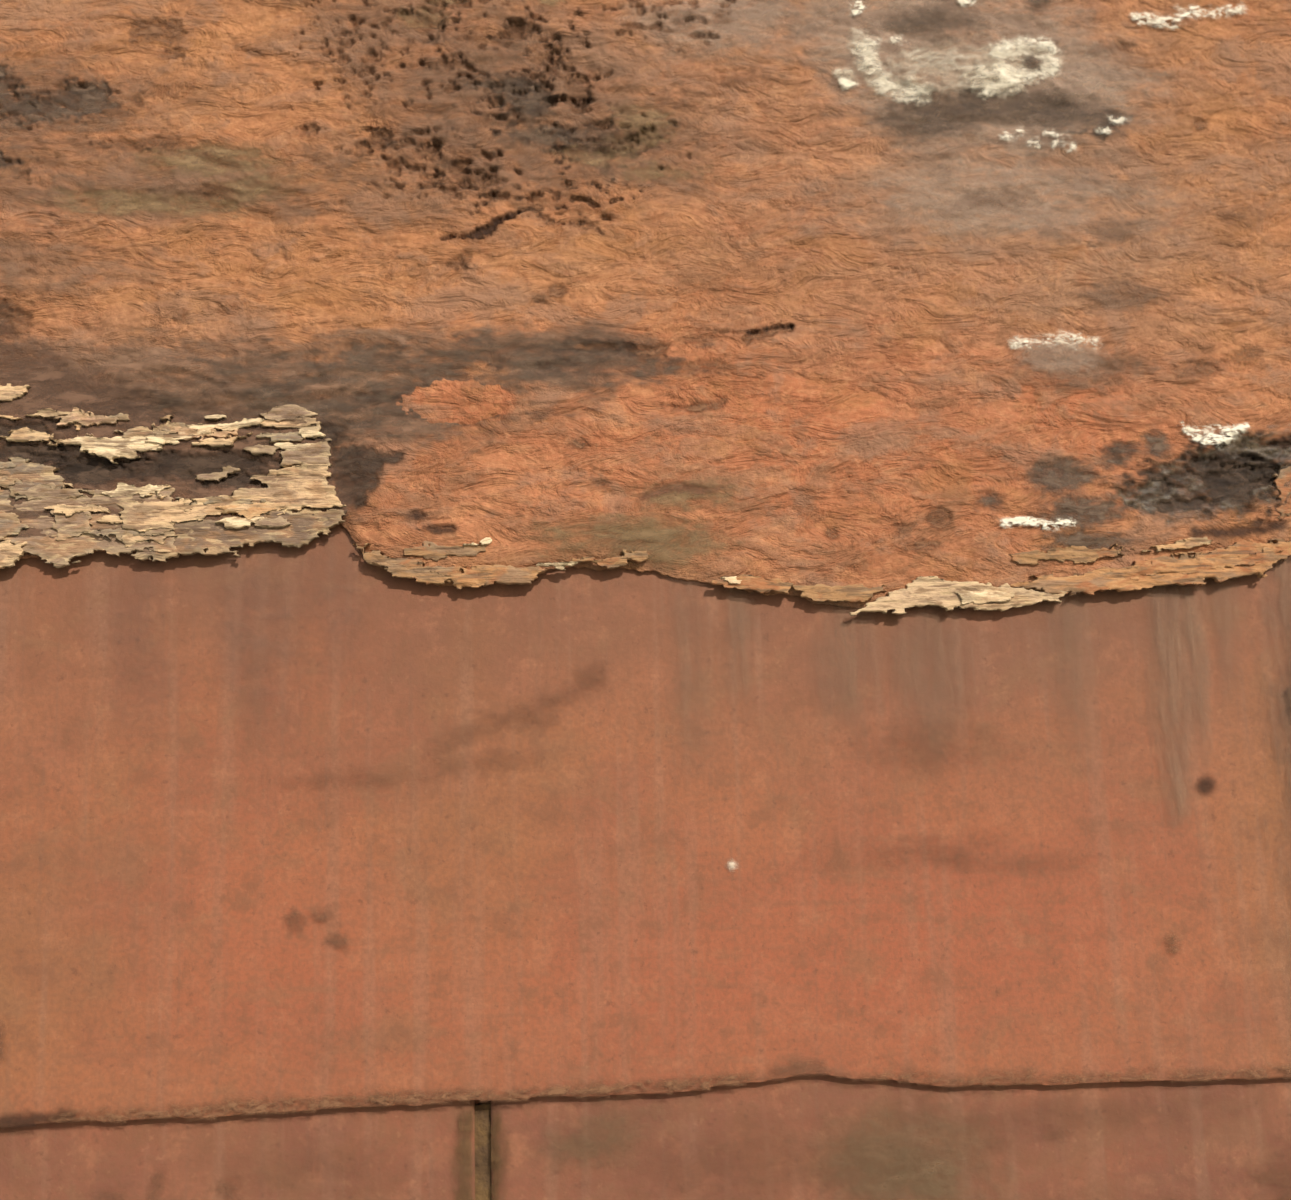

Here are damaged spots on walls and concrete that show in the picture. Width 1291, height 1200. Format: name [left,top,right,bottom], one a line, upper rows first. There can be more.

water stain [643,0,782,48]
water stain [803,0,1141,234]
water stain [0,487,56,555]
peeling [0,383,347,569]
water stain [0,305,680,529]
peeling [353,510,649,590]
peeling [711,537,1291,616]
corrosion [1192,522,1284,537]
corrosion [1269,439,1291,448]
peeling [1272,466,1291,519]
corrosion [1199,778,1214,792]